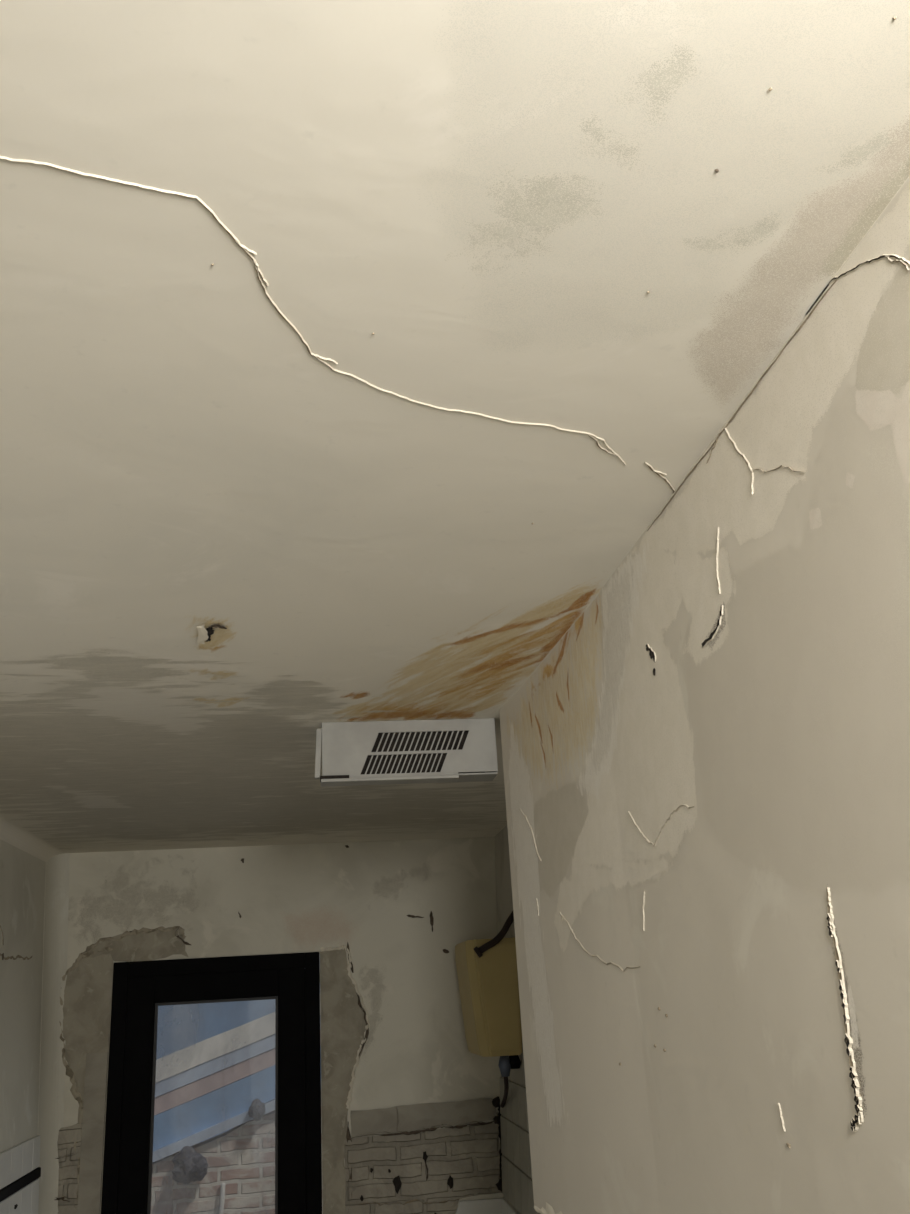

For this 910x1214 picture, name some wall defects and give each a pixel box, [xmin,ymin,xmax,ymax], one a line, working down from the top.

crack [0,156,910,531]
spalling [185,616,236,653]
corrosion [332,577,602,722]
peeling [569,182,910,879]
spalling [55,926,191,1214]
spalling [826,884,867,1132]